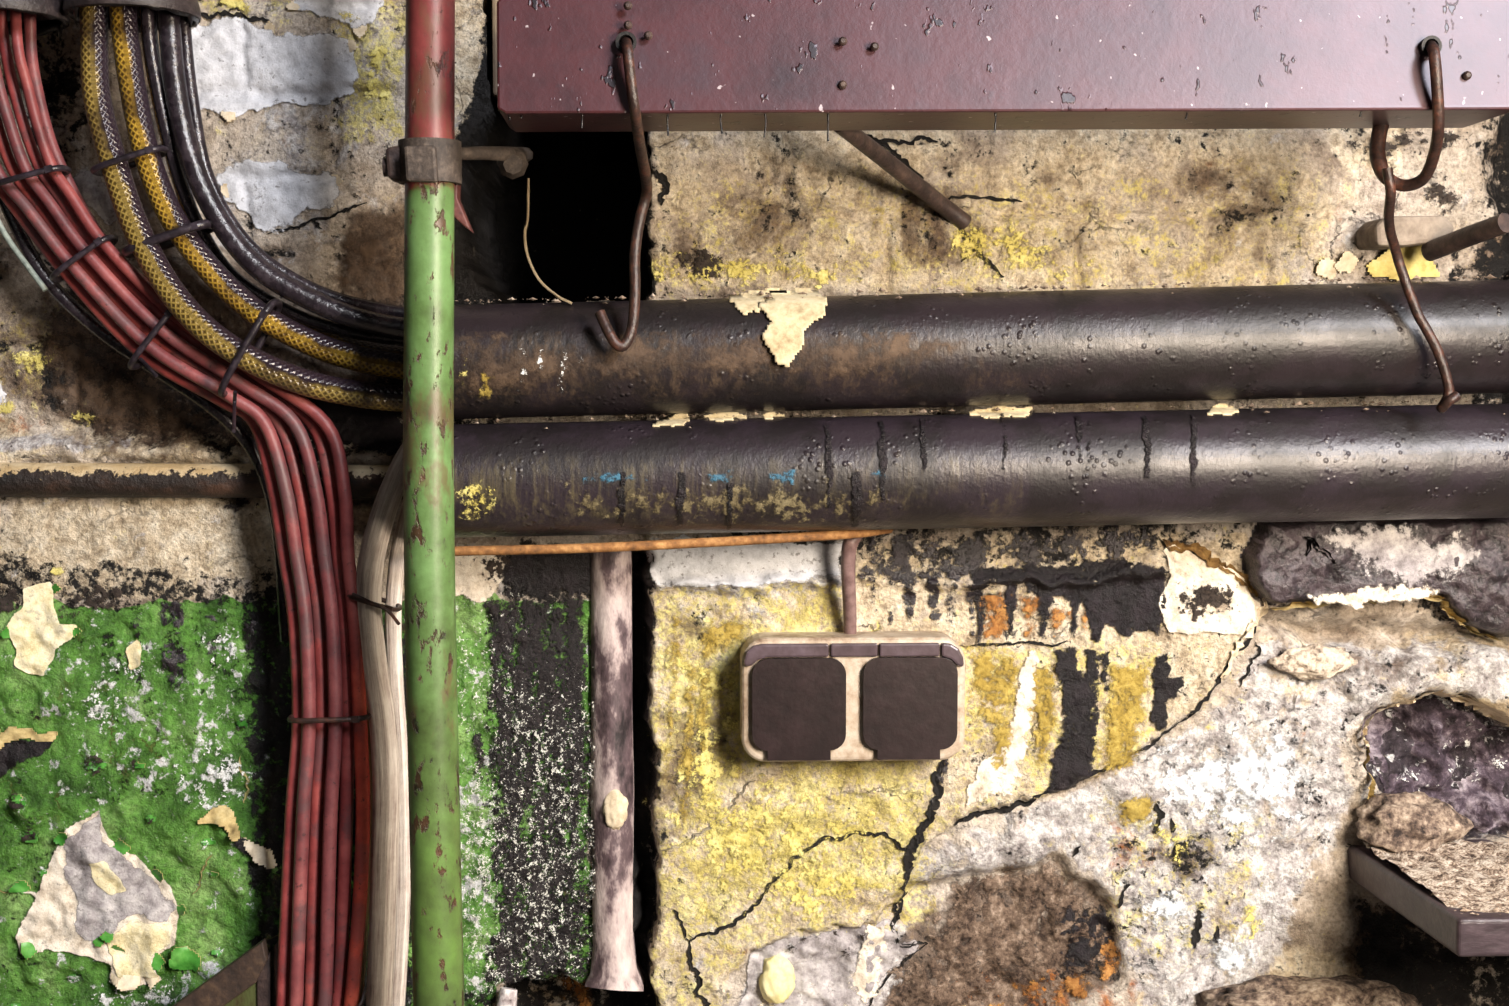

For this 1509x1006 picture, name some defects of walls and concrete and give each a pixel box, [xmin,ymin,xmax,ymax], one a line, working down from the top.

peeling [191,0,384,122]
peeling [216,159,343,234]
damp [216,498,259,515]
damp [0,554,123,619]
flaking render [1159,518,1509,678]
damp [65,601,257,775]
damp [174,714,253,805]
crack [660,626,1282,1006]
spalling [1361,689,1509,833]
peeling [8,811,222,991]
spalling [739,856,1123,1006]
rust [1012,940,1124,1006]